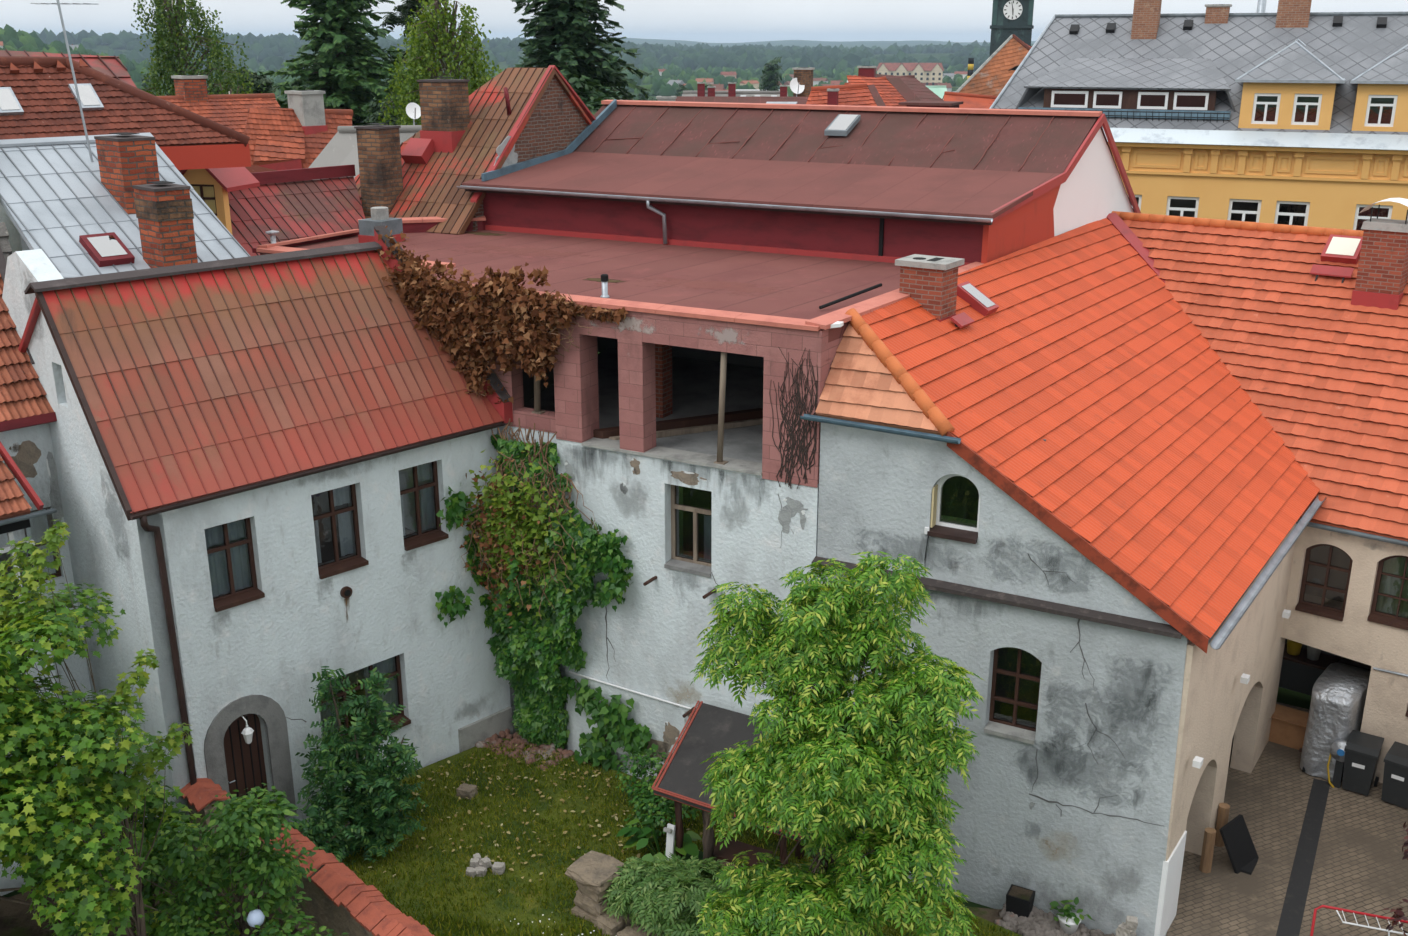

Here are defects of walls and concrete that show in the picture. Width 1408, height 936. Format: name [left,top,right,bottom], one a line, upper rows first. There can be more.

flaking render [670,471,707,485]
flaking render [778,497,808,534]
crack [1027,553,1076,585]
crack [1070,619,1126,763]
crack [1029,749,1162,826]